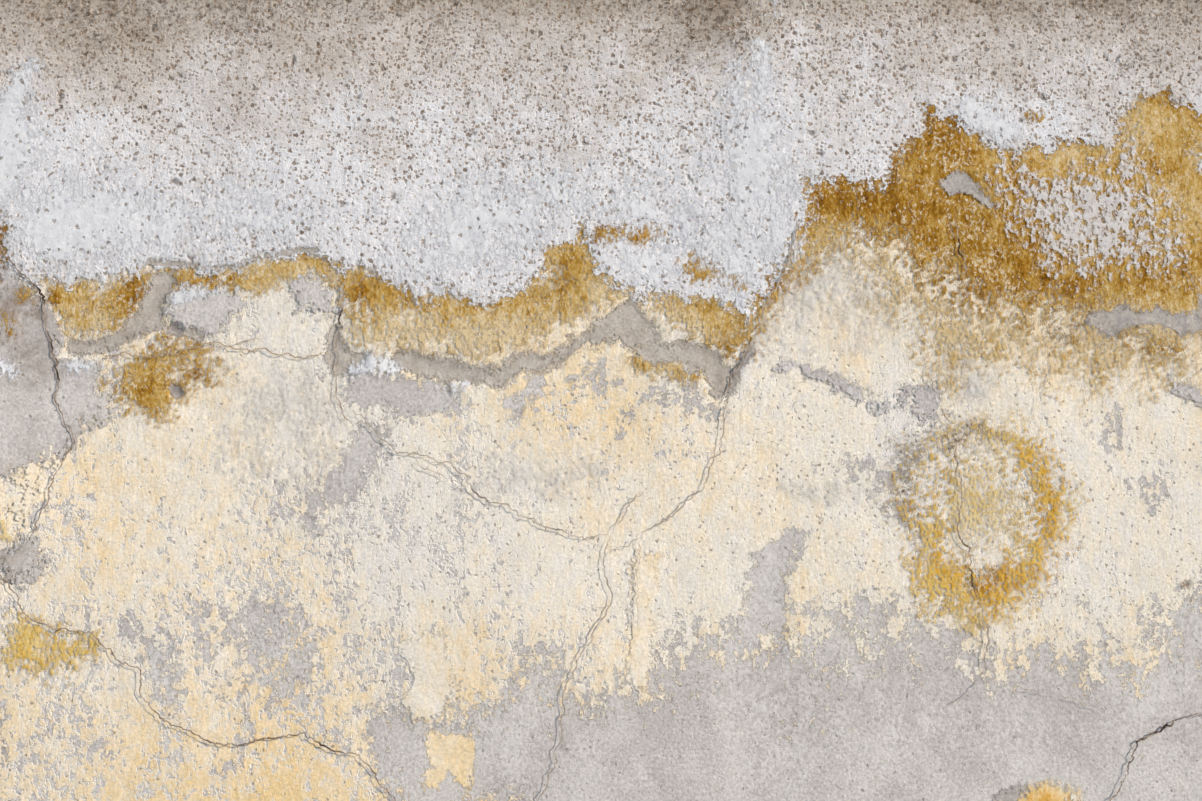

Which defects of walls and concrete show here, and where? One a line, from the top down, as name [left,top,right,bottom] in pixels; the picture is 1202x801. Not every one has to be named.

water stain [0,55,351,305]
water stain [49,0,319,74]
flaking render [0,0,1202,545]
water stain [349,0,898,355]
water stain [949,94,1197,348]
water stain [976,0,1202,78]
crack [0,225,396,801]
crack [103,217,803,801]
water stain [871,359,1090,643]
crack [928,217,1104,713]
peeling [351,525,1202,801]
crack [1110,713,1202,801]